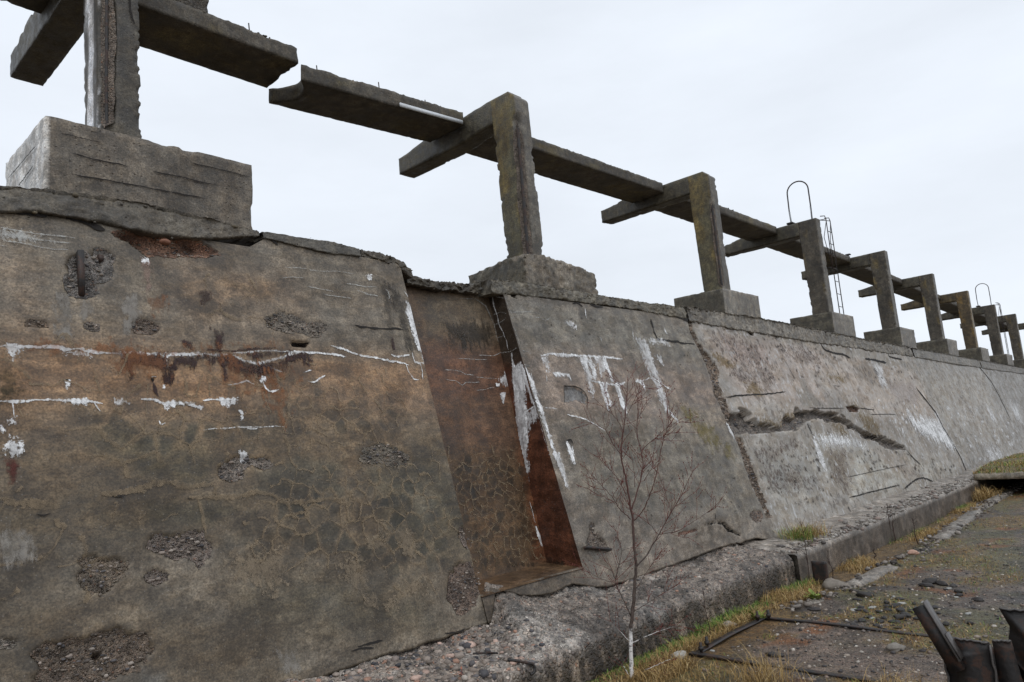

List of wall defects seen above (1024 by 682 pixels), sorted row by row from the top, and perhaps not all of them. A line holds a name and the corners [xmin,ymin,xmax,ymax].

spalling [63,247,116,299]
spalling [111,230,221,259]
rust [121,326,314,385]
spalling [264,311,328,348]
damp [0,379,127,455]
damp [142,376,281,430]
crack [96,297,551,599]
damp [496,328,678,488]
crack [728,385,932,498]
crack [6,486,91,603]
spalling [77,556,130,597]
spalling [30,628,155,682]